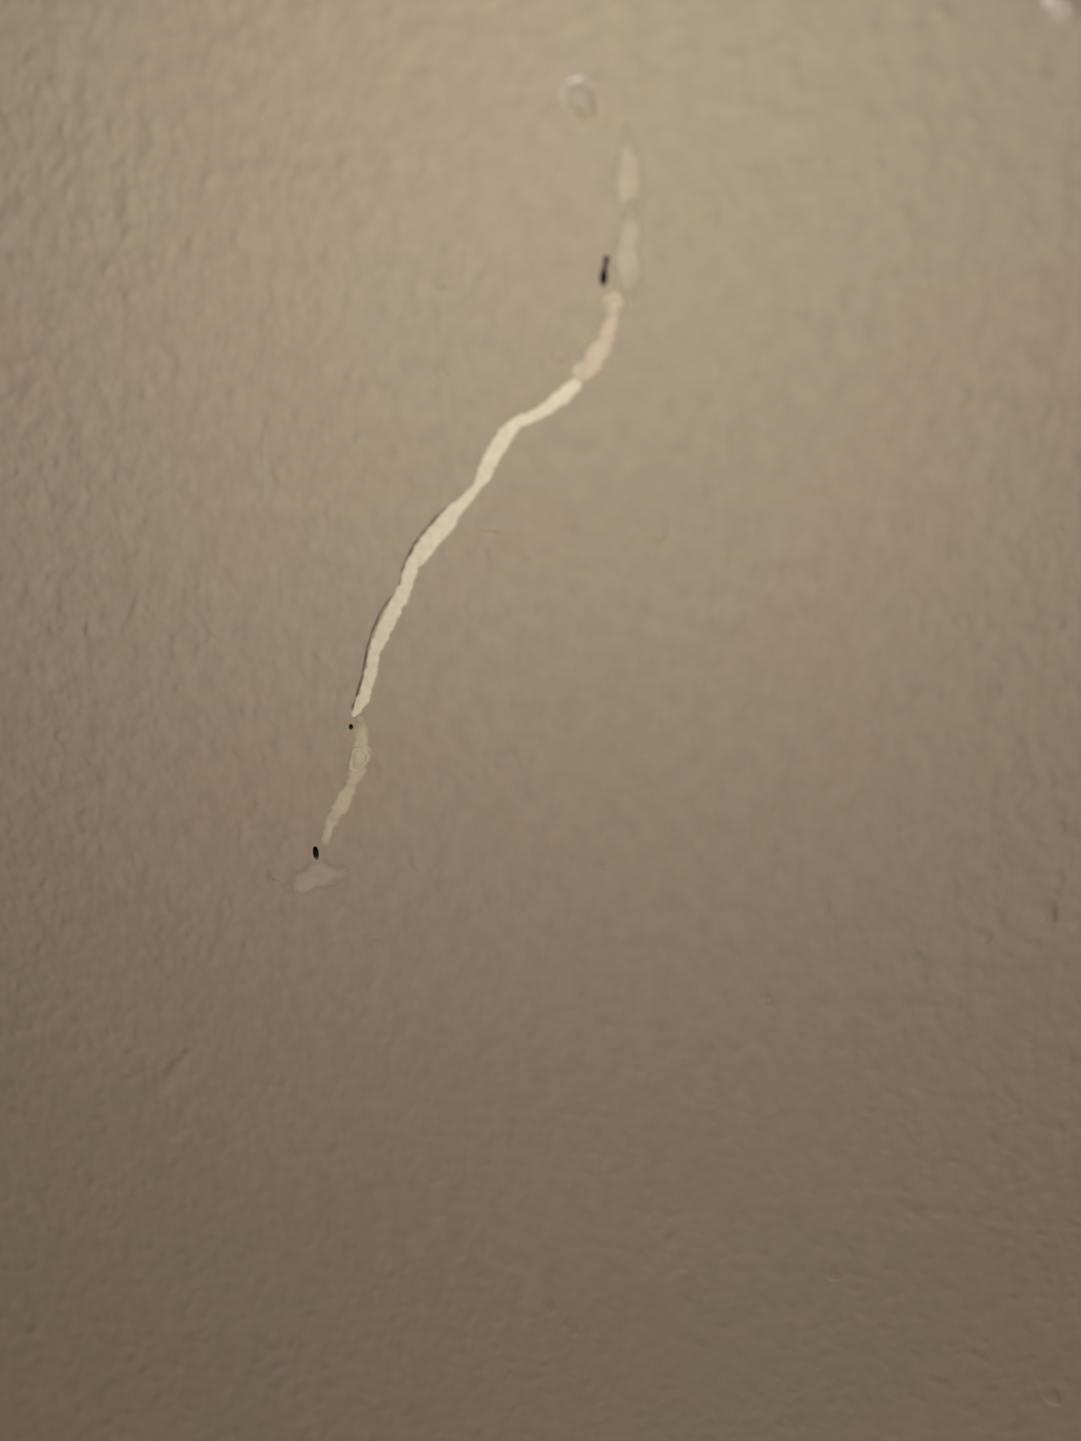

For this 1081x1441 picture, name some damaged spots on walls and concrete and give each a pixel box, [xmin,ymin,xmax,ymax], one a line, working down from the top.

crack [292,136,641,894]